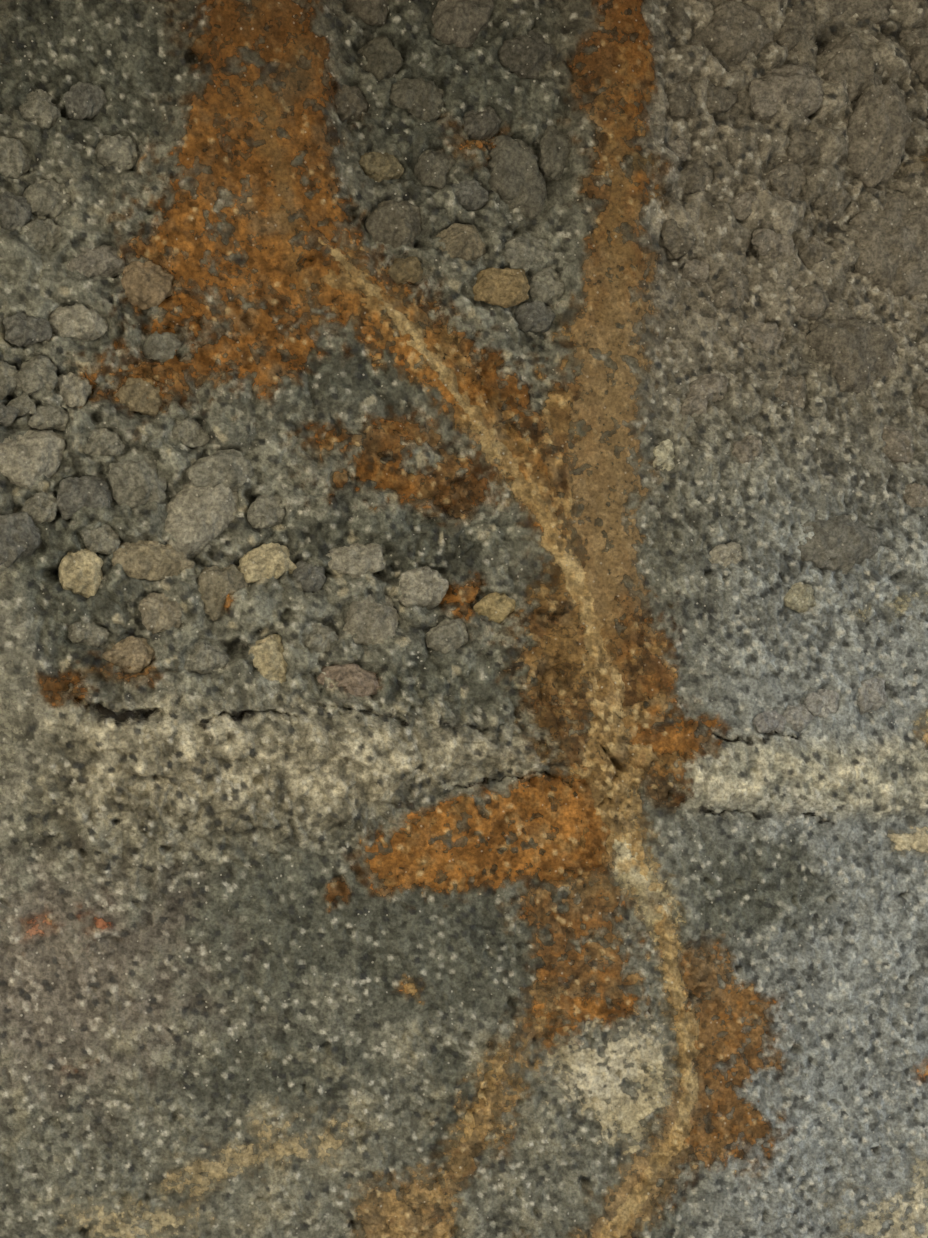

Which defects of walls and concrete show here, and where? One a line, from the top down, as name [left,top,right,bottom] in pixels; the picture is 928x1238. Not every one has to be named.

rust [77,0,730,1054]
crack [86,702,156,726]
crack [199,710,287,730]
crack [318,237,761,1238]
crack [712,731,798,745]
rust [657,939,794,1209]